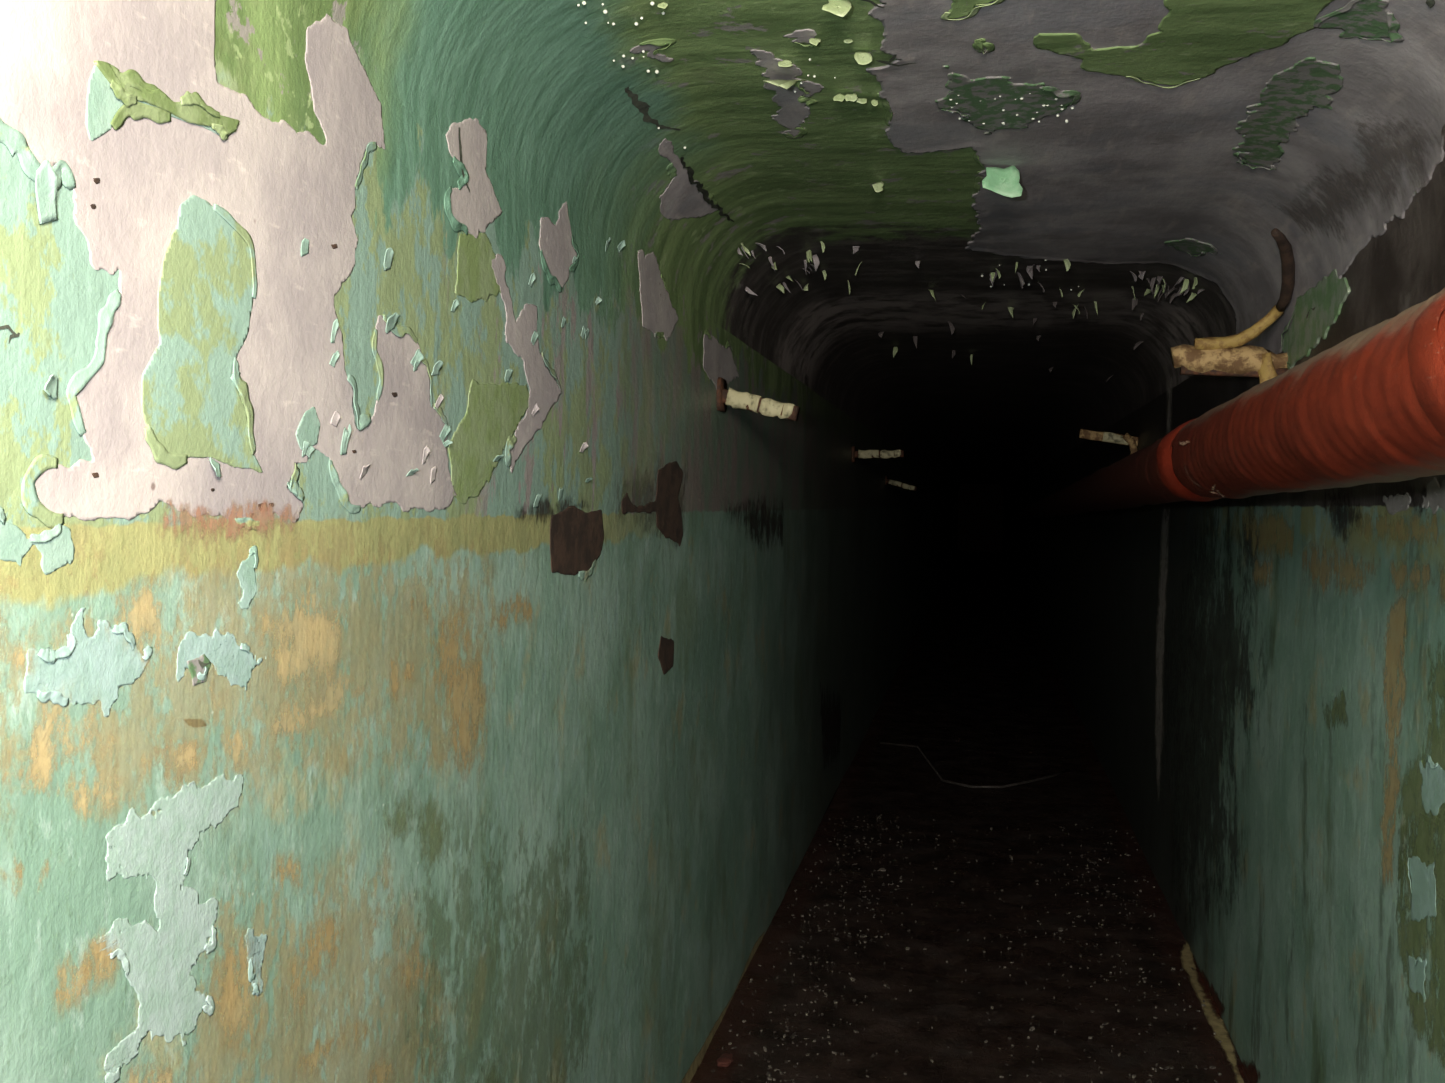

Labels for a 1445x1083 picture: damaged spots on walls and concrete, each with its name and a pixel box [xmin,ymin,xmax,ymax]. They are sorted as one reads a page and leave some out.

peeling [630,38,676,62]
crack [625,87,681,131]
peeling [658,138,734,222]
peeling [737,0,1445,370]
peeling [0,0,579,609]
peeling [605,237,678,341]
spalling [519,488,604,582]
spalling [621,461,683,546]
peeling [24,608,153,717]
peeling [176,627,267,691]
peeling [94,774,244,1083]